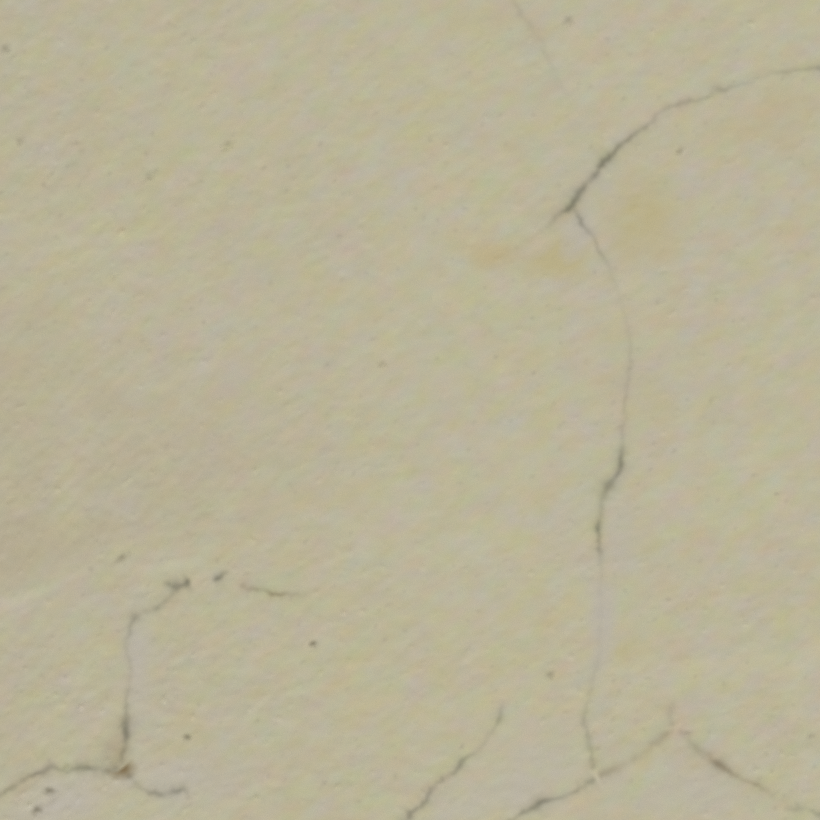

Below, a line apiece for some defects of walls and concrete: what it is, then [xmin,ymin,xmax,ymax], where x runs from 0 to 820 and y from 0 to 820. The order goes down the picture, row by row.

crack [492,55,820,820]
crack [106,563,312,750]
crack [0,751,197,807]